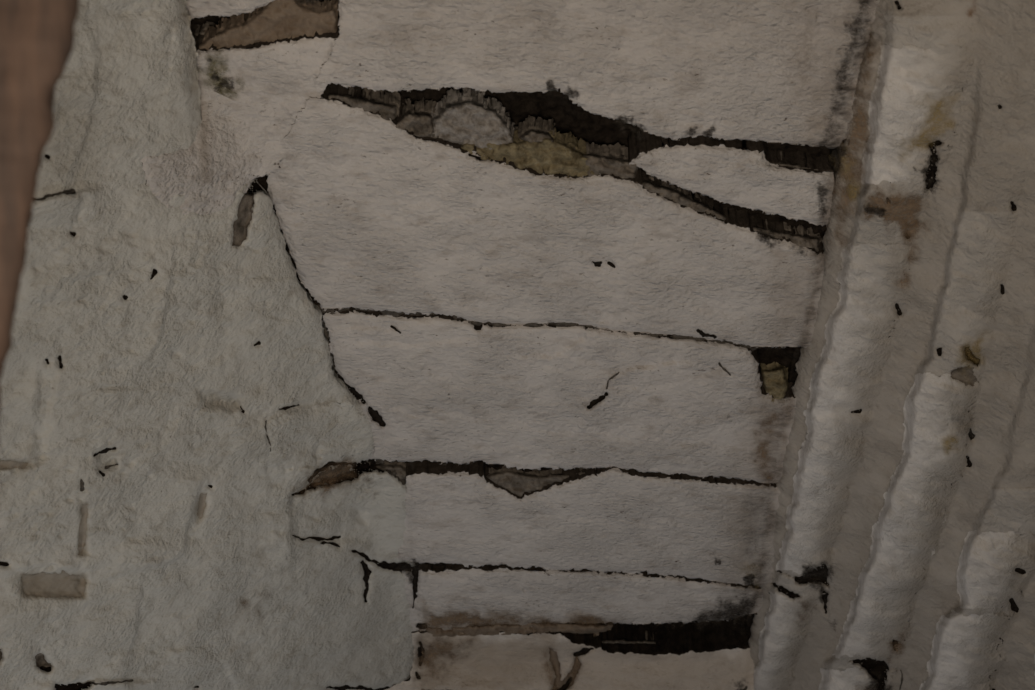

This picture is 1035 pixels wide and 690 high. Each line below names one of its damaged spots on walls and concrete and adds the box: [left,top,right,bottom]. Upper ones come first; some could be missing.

peeling [191,0,339,50]
crack [258,175,757,427]
peeling [758,346,795,402]
crack [788,347,801,383]
crack [265,404,300,452]
crack [292,459,415,496]
crack [480,460,585,497]
flaking render [21,570,87,598]
crack [292,535,682,690]
crack [707,614,754,637]
crack [773,565,829,614]
crack [90,678,133,686]